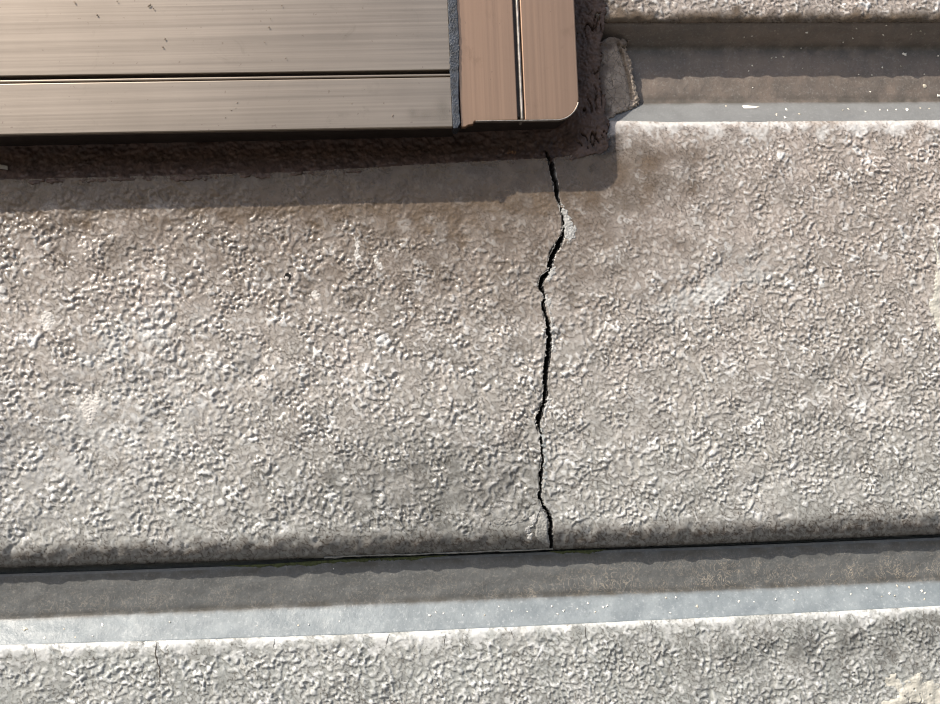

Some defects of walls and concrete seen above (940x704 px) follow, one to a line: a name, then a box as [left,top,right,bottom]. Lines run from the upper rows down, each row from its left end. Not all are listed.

crack [529,151,577,548]